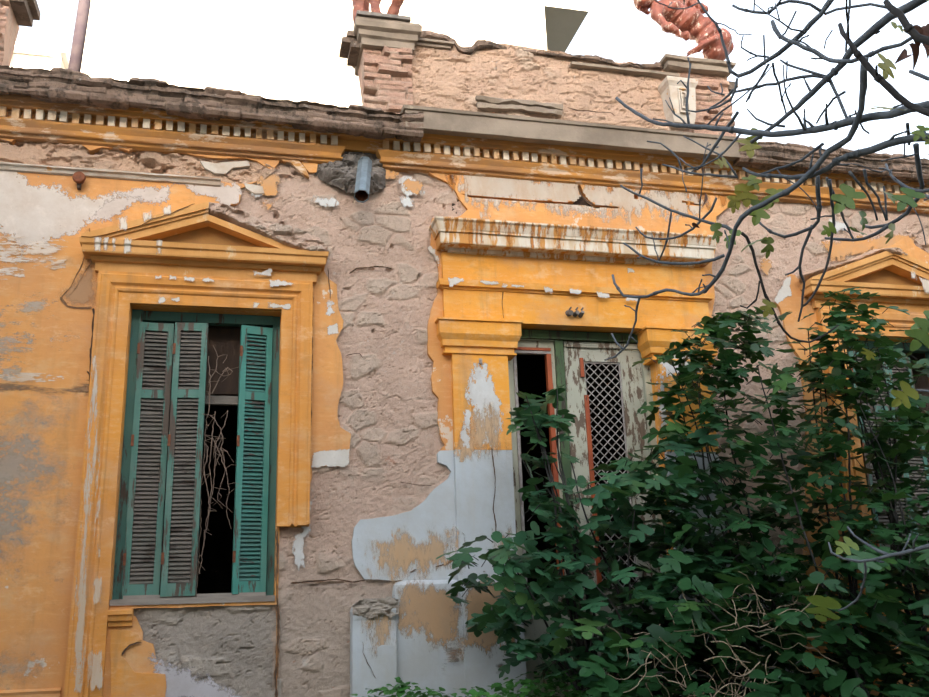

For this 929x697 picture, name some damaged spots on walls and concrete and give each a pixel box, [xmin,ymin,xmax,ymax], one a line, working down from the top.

crack [578,186,616,207]
spalling [0,142,704,697]
spalling [656,201,929,563]